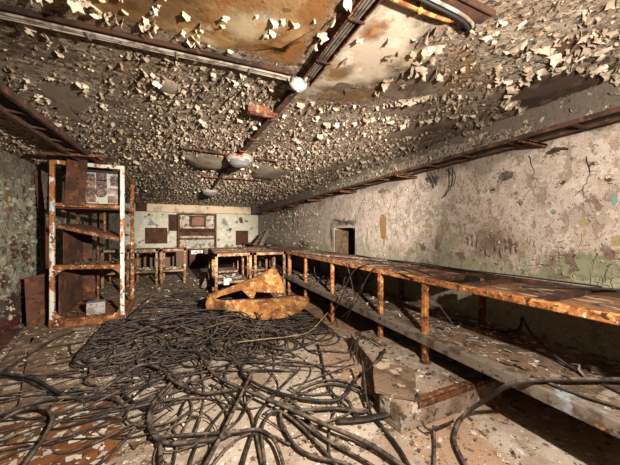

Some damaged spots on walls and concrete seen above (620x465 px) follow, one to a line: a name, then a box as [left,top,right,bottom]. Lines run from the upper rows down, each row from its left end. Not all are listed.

corrosion [82,0,332,64]
water stain [315,1,434,101]
peeling [0,0,620,261]
peeling [0,168,42,322]
water stain [466,222,518,257]